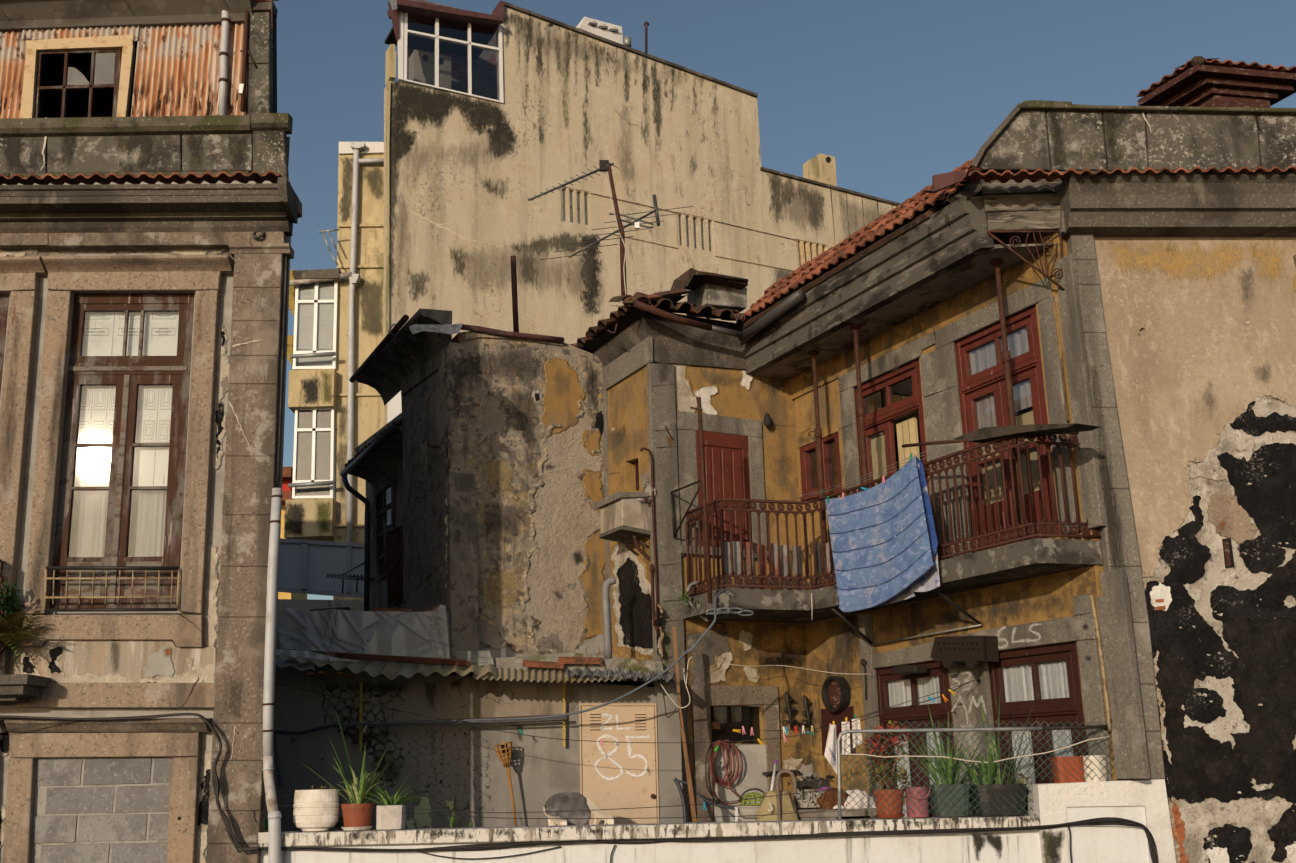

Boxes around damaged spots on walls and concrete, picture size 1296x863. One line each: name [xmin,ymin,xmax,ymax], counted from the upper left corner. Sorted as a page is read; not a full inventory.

leakage [340,82,517,334]
leakage [770,174,824,227]
leakage [514,232,602,313]
peeling [670,364,720,416]
spalling [739,370,755,391]
spalling [521,358,664,657]
flaking render [200,544,220,647]
spalling [1142,391,1296,863]
flaking render [20,645,216,683]
spalling [685,629,762,686]
flaking render [199,750,214,803]